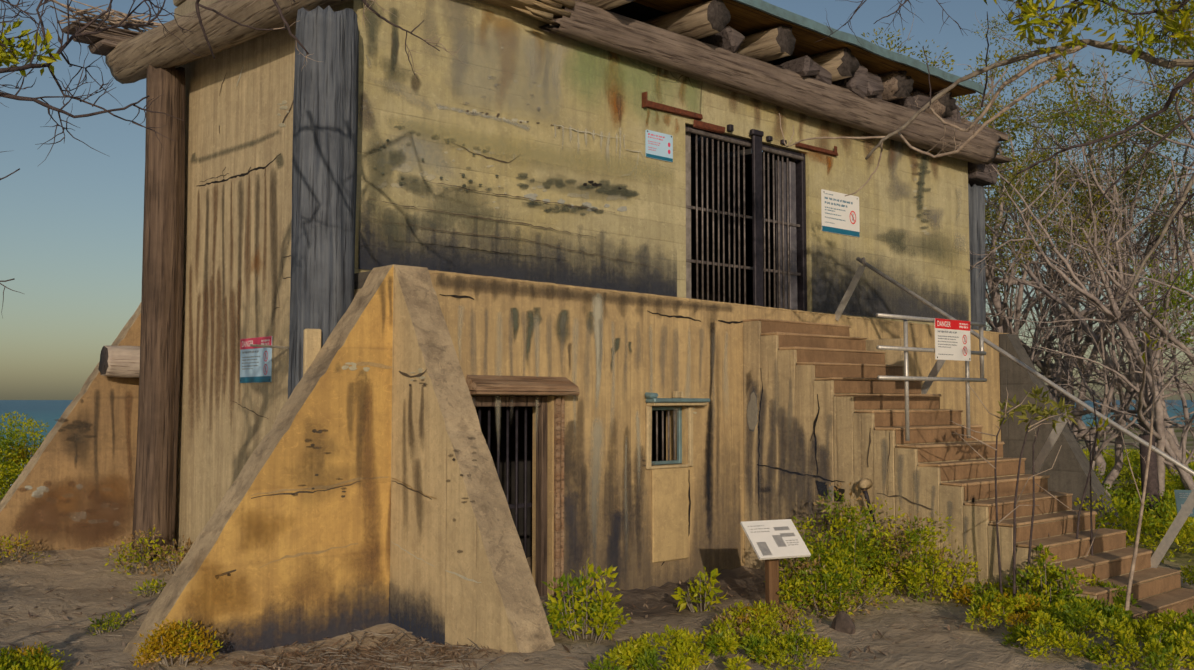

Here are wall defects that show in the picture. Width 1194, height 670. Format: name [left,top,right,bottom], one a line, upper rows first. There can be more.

damp [365,9,398,81]
rust [607,51,623,121]
crack [197,154,280,187]
peeling [373,125,520,209]
peeling [517,173,637,215]
damp [890,140,916,194]
damp [358,230,731,397]
crack [251,476,437,500]
damp [408,387,423,445]
damp [705,324,715,529]
crack [757,368,844,507]
crack [867,428,932,510]